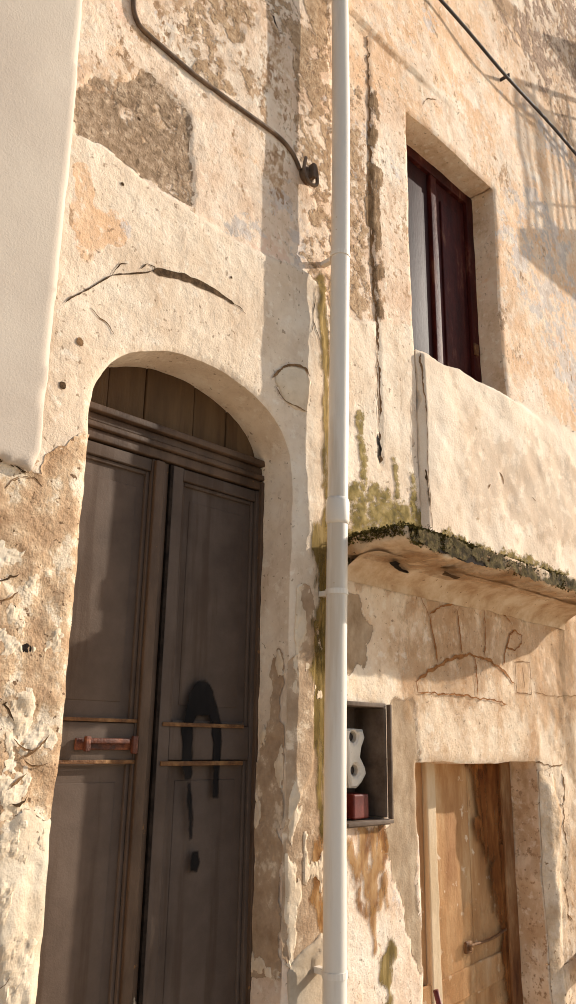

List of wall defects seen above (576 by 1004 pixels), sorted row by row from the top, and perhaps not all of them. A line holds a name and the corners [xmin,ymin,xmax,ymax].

spalling [74,68,195,207]
crack [66,263,245,334]
spalling [159,0,332,319]
crack [366,36,383,463]
spalling [494,0,576,136]
water stain [309,271,330,842]
water stain [348,410,576,591]
flaking render [0,433,89,1004]
flaking render [251,583,324,982]
crack [416,598,576,705]
water stain [379,940,397,1004]